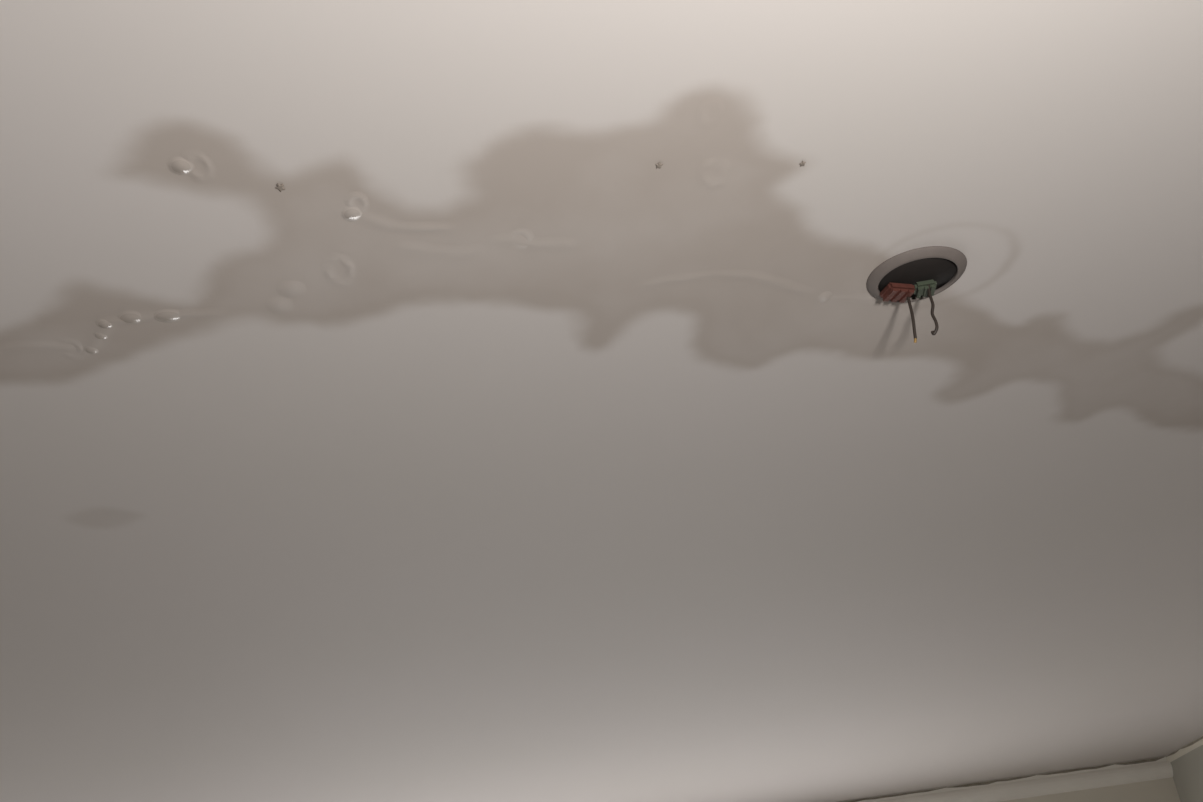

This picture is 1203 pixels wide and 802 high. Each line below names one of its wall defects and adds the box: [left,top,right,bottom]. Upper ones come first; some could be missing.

damp [0,71,1203,438]